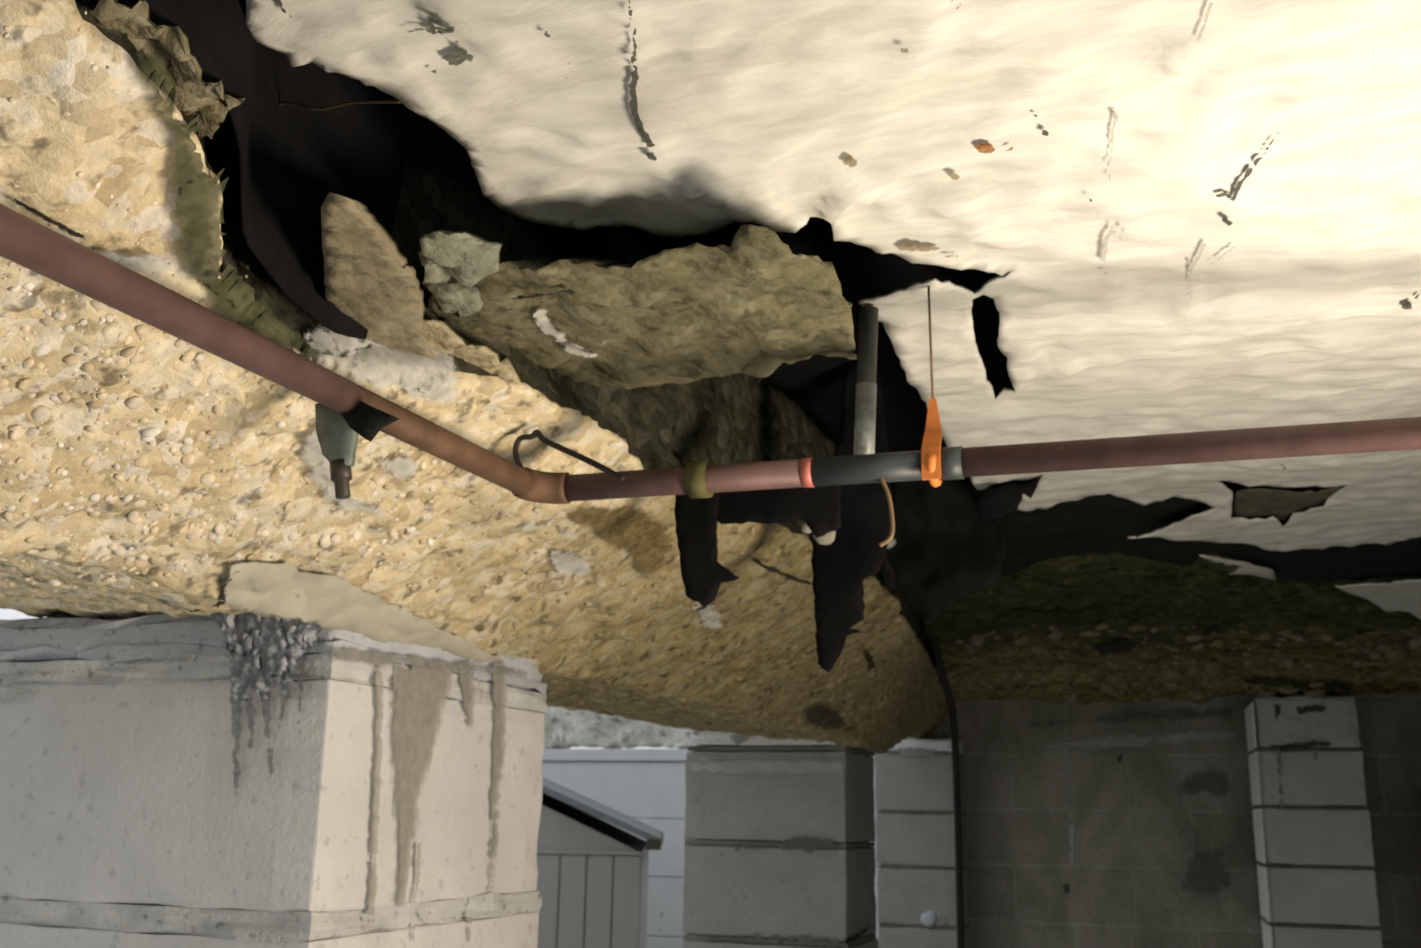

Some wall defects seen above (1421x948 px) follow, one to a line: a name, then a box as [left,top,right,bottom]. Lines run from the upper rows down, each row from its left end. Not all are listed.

spalling [86,0,245,139]
spalling [321,192,857,397]
spalling [570,508,676,578]
leakage [210,612,527,923]